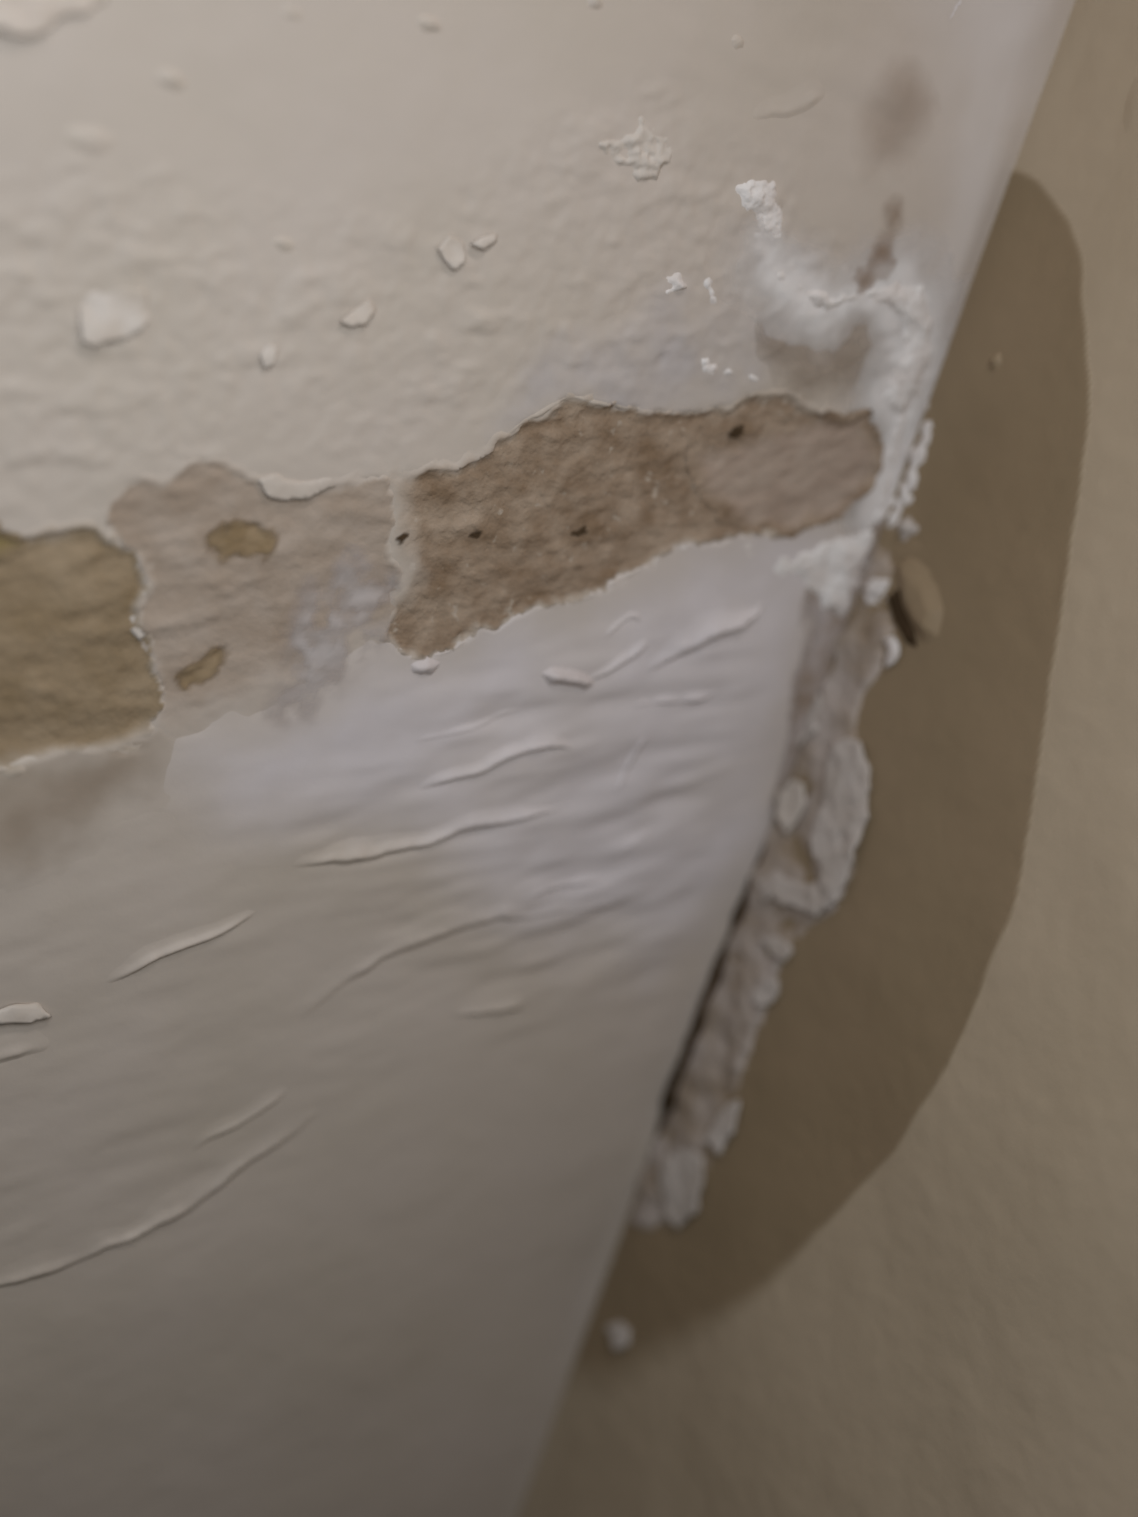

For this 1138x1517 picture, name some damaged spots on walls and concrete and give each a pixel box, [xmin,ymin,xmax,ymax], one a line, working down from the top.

peeling [0,0,109,37]
spalling [0,387,884,779]
peeling [0,1003,52,1025]
leakage [0,167,1094,1404]
spalling [627,519,901,1230]